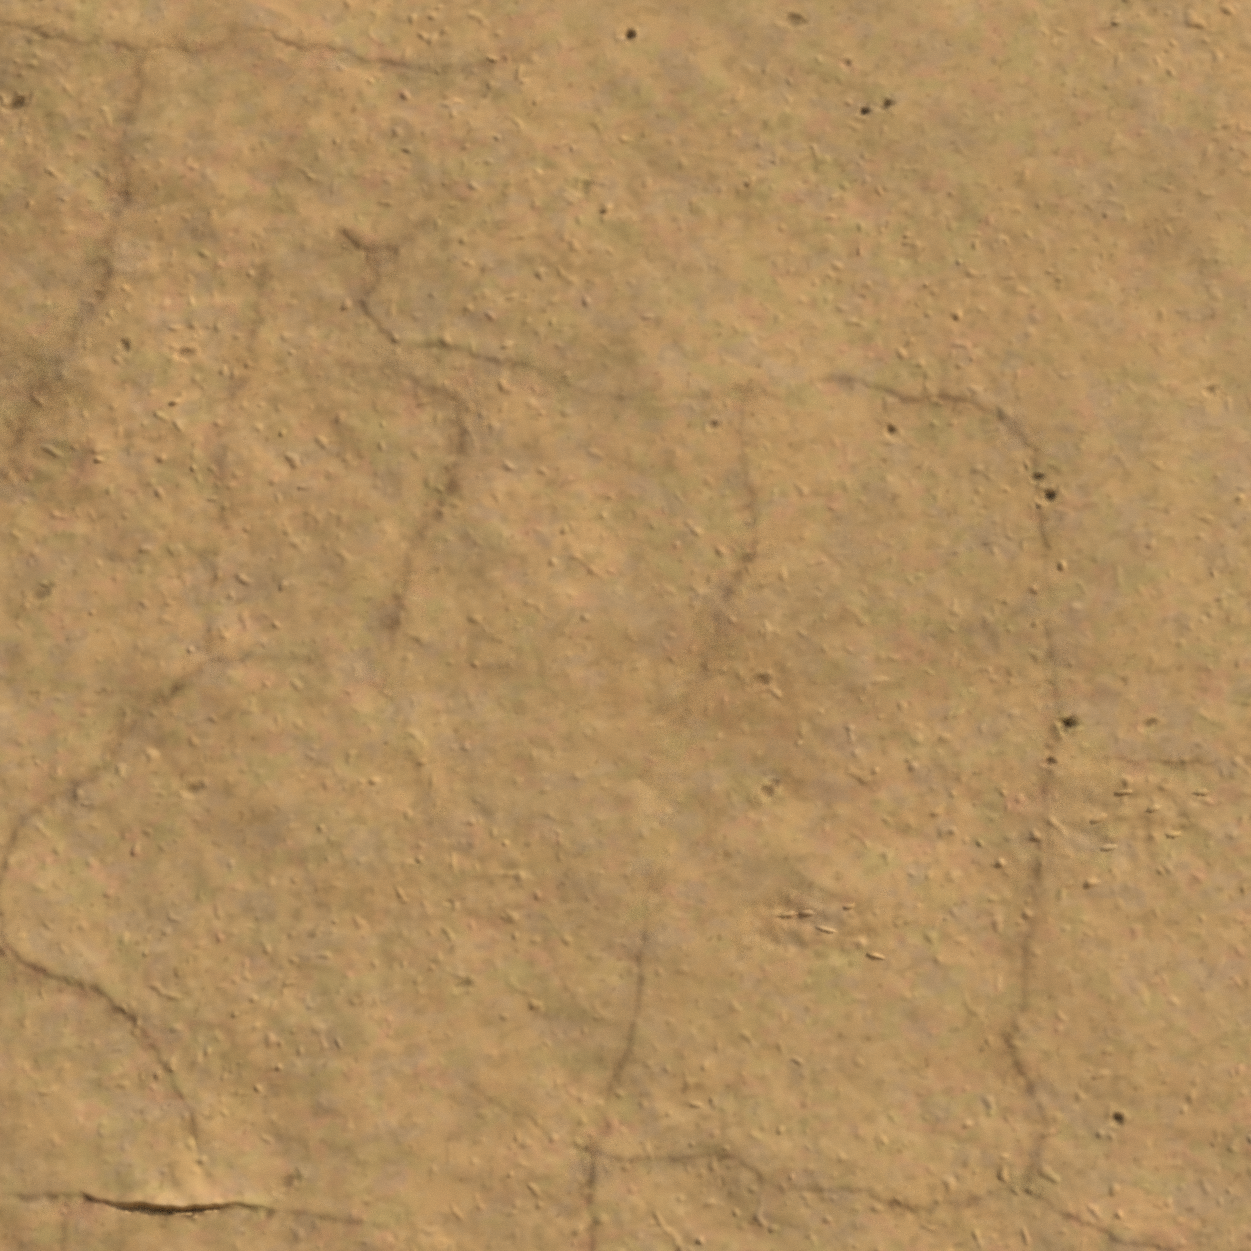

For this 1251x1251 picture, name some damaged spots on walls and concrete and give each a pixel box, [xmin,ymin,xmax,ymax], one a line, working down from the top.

crack [159,1208,203,1217]